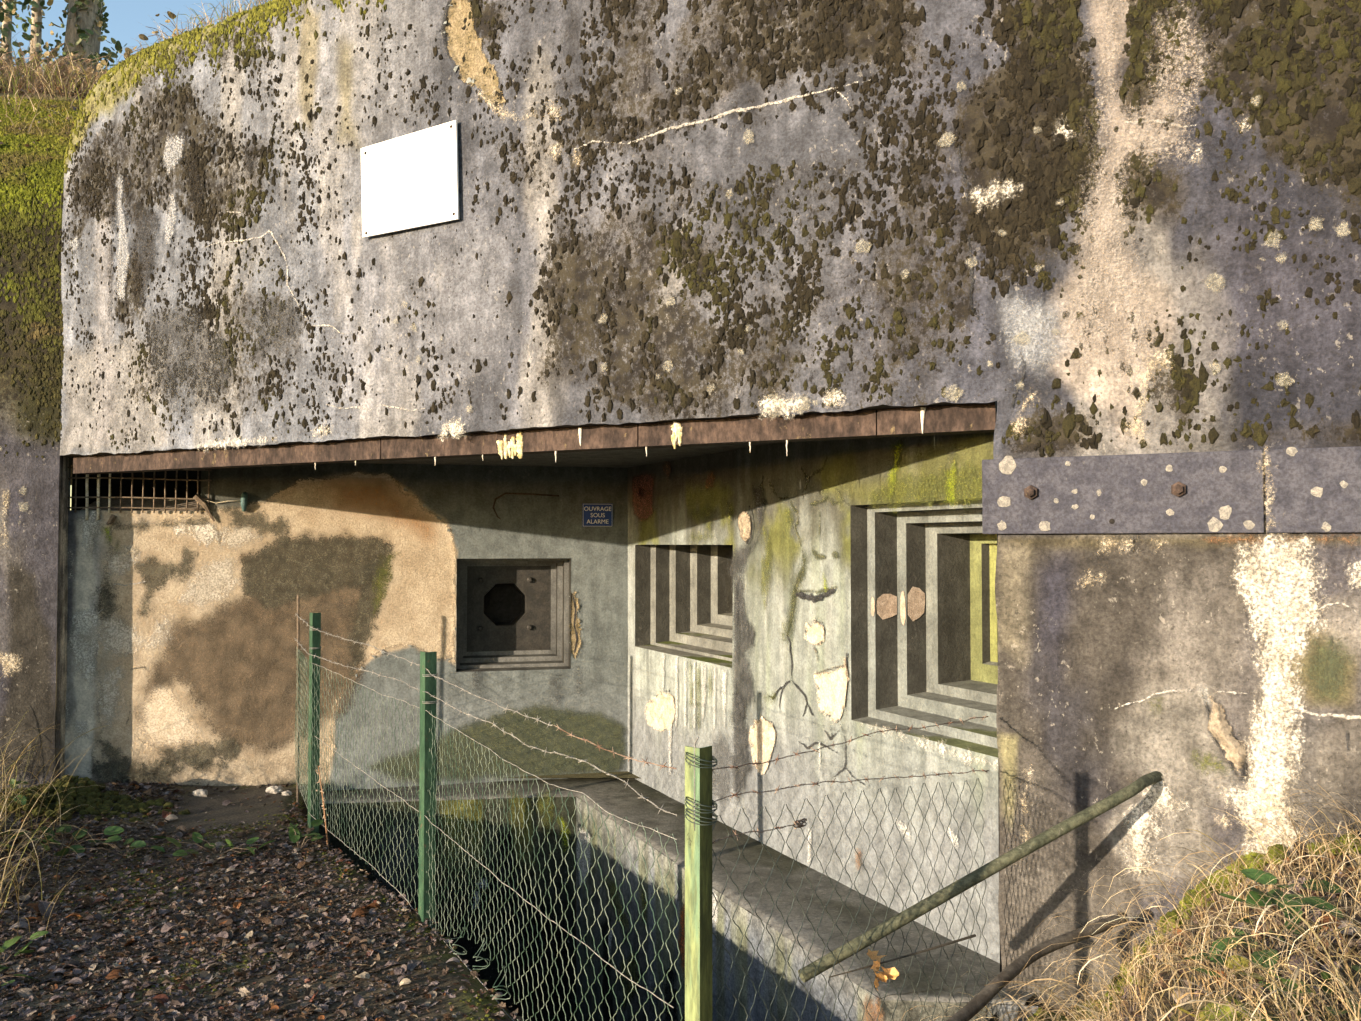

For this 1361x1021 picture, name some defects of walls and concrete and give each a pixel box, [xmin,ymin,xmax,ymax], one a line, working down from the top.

spalling [441,0,513,117]
crack [575,81,858,149]
leakage [1134,8,1205,163]
leakage [973,181,1021,211]
leakage [1057,0,1170,439]
leakage [55,507,399,784]
spalling [748,716,775,775]
crack [760,457,864,785]
spalling [804,618,849,723]
peeling [871,587,925,625]
crack [1115,690,1247,709]
leakage [1216,535,1326,866]